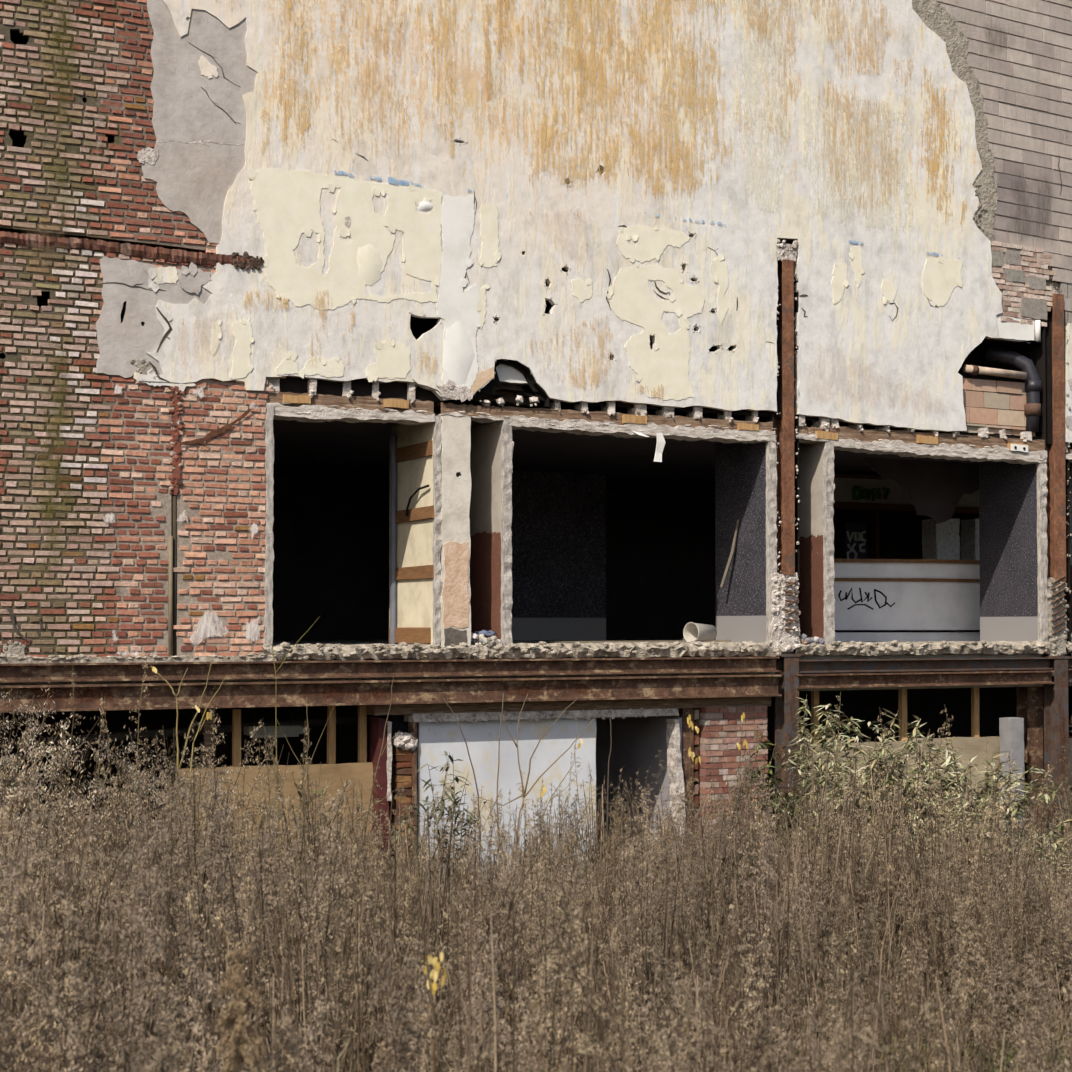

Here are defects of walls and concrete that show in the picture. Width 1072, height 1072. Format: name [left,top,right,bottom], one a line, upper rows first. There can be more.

peeling [198,55,218,79]
leakage [260,0,316,152]
leakage [332,0,459,157]
leakage [483,0,967,227]
peeling [136,147,159,165]
spalling [973,179,987,233]
peeling [148,262,211,295]
peeling [921,256,963,307]
peeling [606,225,717,401]
peeling [129,358,195,391]
peeling [211,319,254,379]
peeling [231,168,550,647]